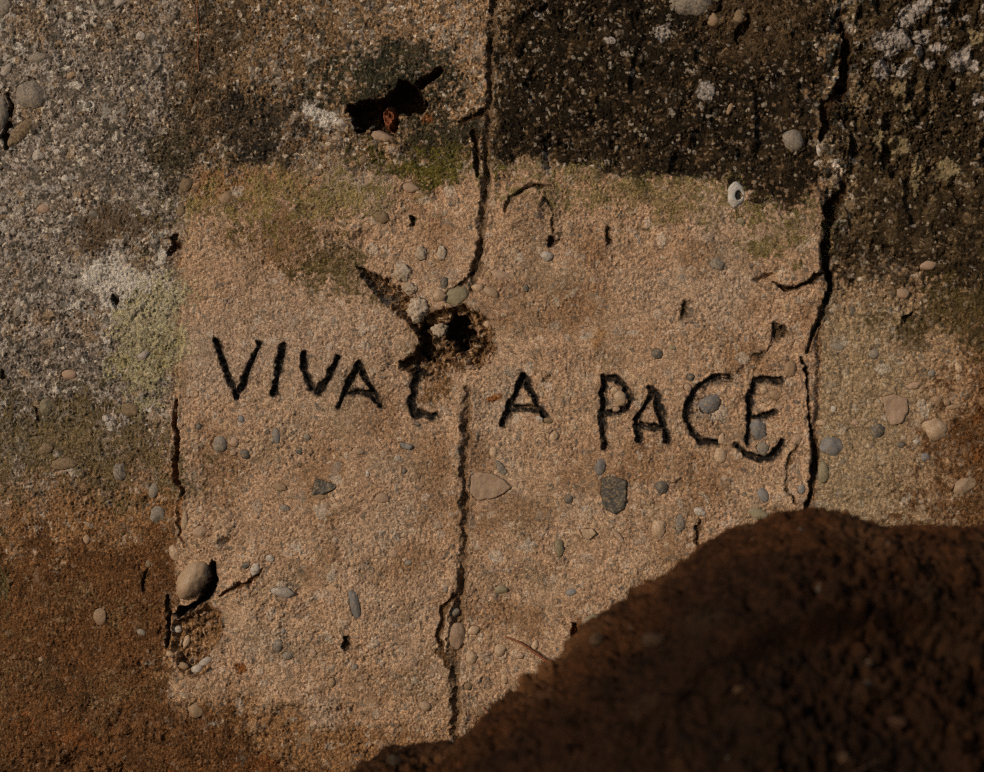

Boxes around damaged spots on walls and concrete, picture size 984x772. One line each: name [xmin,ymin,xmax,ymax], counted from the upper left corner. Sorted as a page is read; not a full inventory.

spalling [345,66,444,140]
crack [454,0,499,293]
damp [144,0,984,293]
crack [818,22,852,142]
crack [772,176,847,301]
spalling [363,268,496,408]
crack [172,400,186,548]
crack [784,351,820,509]
spalling [169,561,262,678]
crack [434,386,473,742]